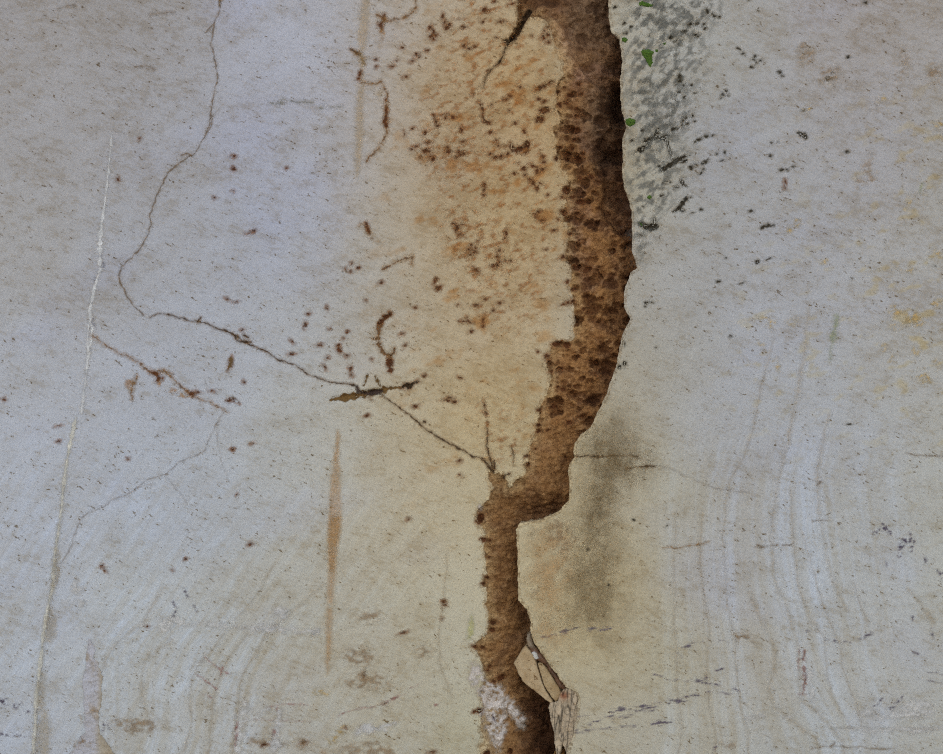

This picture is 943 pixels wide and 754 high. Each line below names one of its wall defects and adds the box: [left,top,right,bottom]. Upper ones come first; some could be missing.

spalling [411,14,465,62]
spalling [404,112,465,162]
spalling [488,81,594,247]
water stain [627,0,712,224]
spalling [561,255,600,324]
crack [93,336,226,412]
spalling [324,330,427,402]
spalling [371,311,406,373]
spalling [537,341,600,374]
water stain [469,663,526,751]
peeling [514,644,562,703]